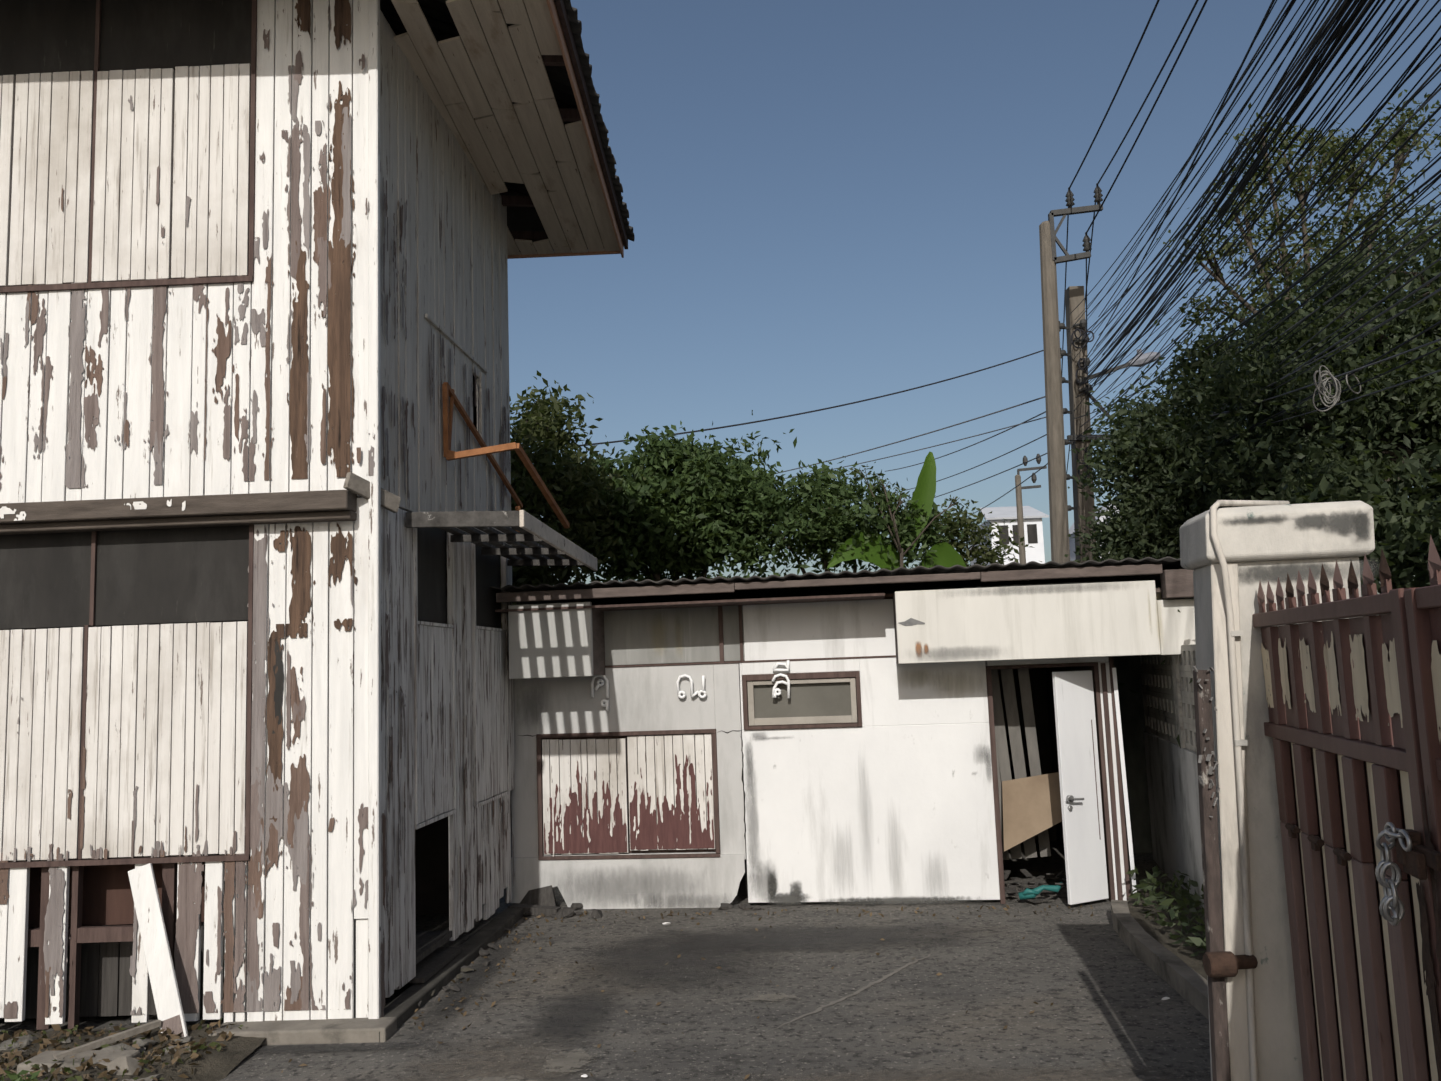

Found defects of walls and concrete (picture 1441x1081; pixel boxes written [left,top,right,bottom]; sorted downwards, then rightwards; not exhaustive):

peeling [189,0,510,511]
peeling [0,280,130,488]
peeling [114,272,186,511]
peeling [0,506,26,521]
leakage [1230,513,1369,539]
peeling [0,745,107,1019]
peeling [131,523,358,1014]
peeling [351,613,515,1017]
peeling [1261,631,1369,722]
peeling [1382,638,1403,728]
peeling [1431,640,1441,741]